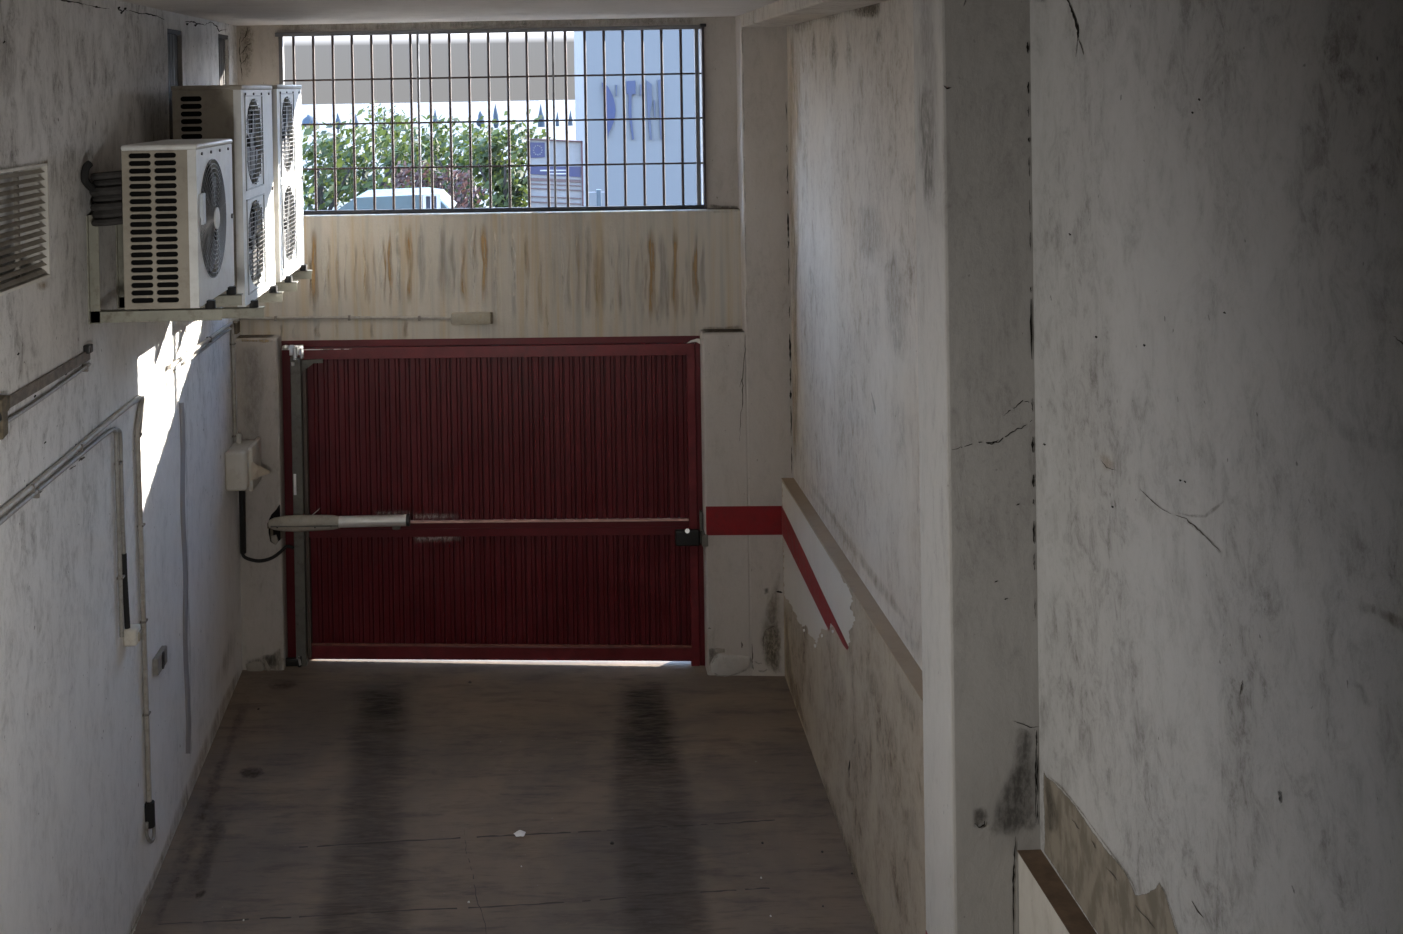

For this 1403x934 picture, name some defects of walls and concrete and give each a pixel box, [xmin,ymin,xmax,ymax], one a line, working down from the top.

crack [1067,0,1084,55]
rust [383,236,412,297]
rust [672,242,699,305]
crack [1027,287,1035,356]
crack [953,400,1035,570]
crack [1142,491,1220,551]
peeling [782,483,855,648]
peeling [1044,773,1177,934]